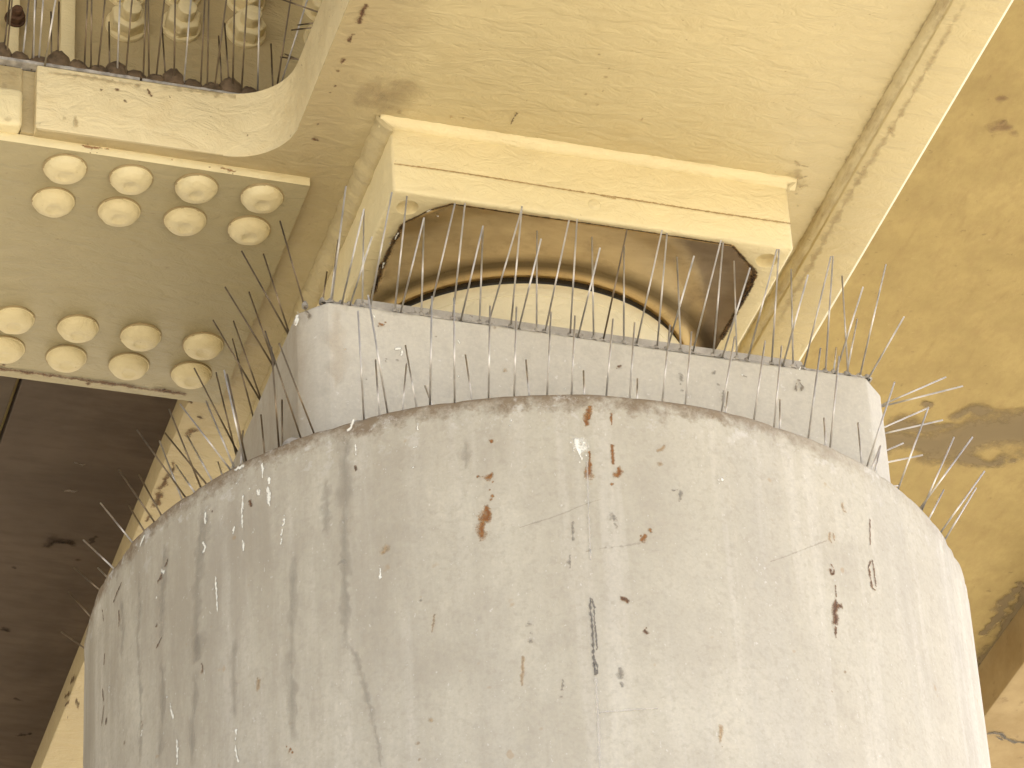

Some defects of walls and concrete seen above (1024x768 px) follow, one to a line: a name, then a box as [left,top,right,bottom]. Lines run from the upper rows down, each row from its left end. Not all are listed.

corrosion [610,444,622,486]
damp [885,405,1024,467]
corrosion [477,473,494,541]
crack [589,598,598,675]
corrosion [830,564,843,635]
damp [977,582,1024,667]